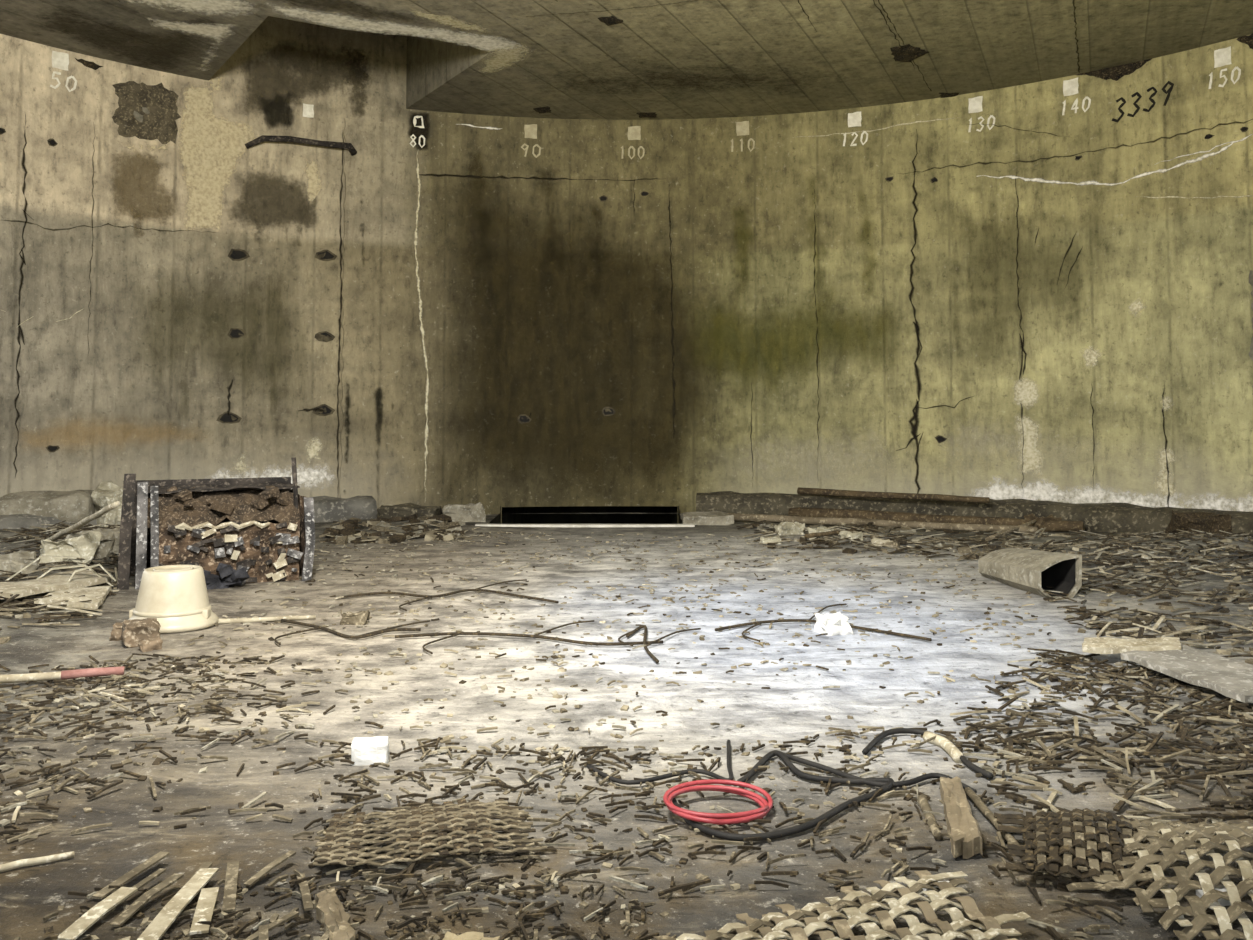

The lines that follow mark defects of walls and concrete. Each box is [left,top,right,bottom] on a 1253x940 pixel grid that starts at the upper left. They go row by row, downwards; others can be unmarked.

spalling [75,58,104,70]
crack [873,0,931,91]
crack [1072,0,1080,73]
spalling [1236,34,1253,49]
water stain [114,154,173,235]
flaking render [112,78,255,229]
water stain [234,173,315,227]
flaking render [306,162,321,201]
water stain [461,190,701,474]
crack [896,119,1252,507]
water stain [214,440,330,486]
water stain [975,379,1253,512]